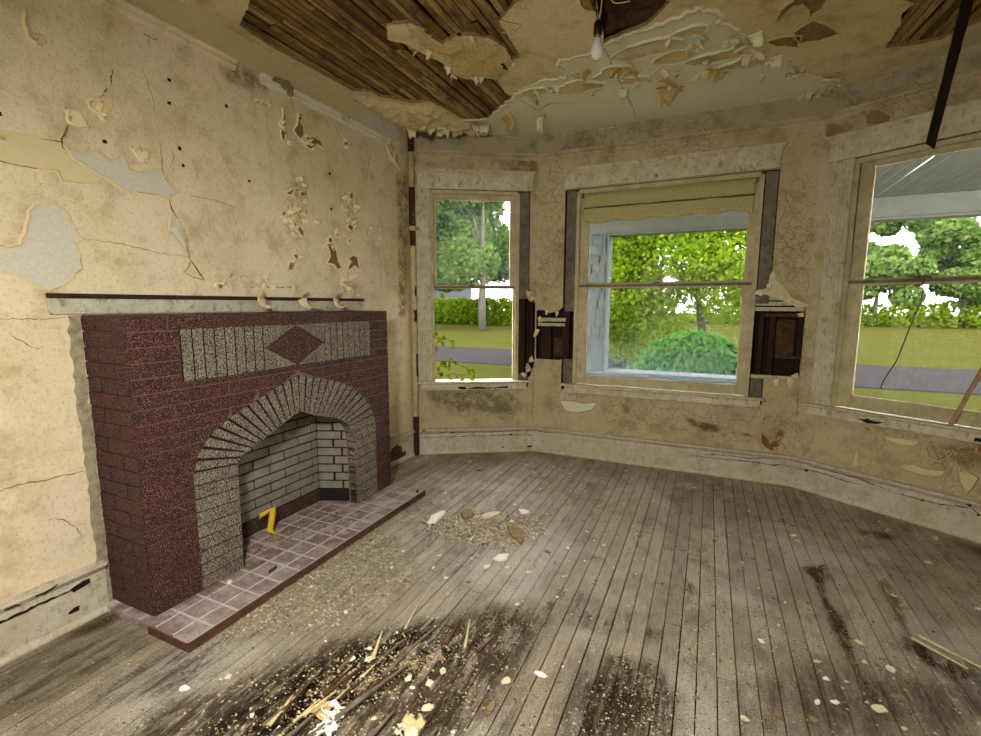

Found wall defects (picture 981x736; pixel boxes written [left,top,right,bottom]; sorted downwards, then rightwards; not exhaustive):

peeling [461,0,851,139]
peeling [0,129,178,200]
peeling [278,107,324,151]
peeling [0,202,85,292]
crack [86,149,237,277]
peeling [168,212,276,294]
peeling [280,175,322,271]
peeling [323,190,361,297]
crack [927,441,981,483]